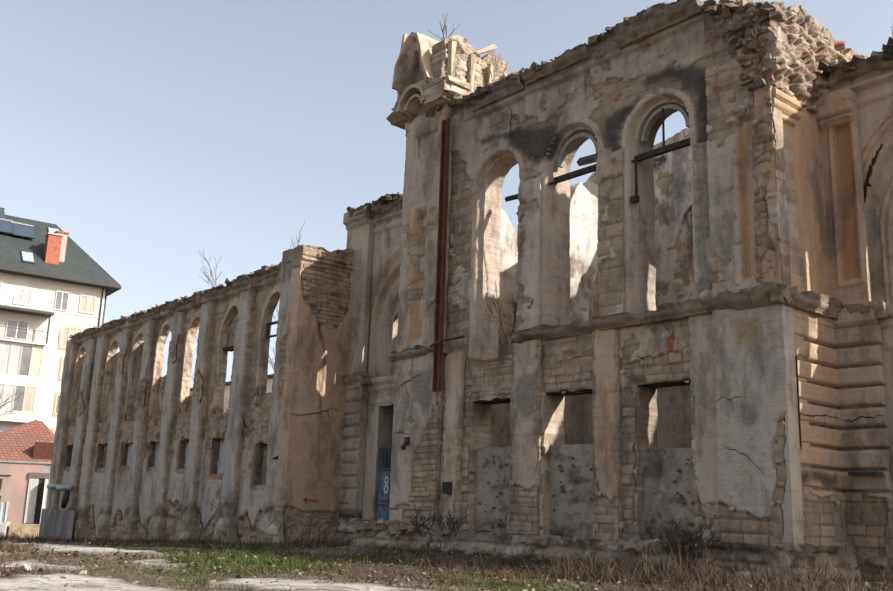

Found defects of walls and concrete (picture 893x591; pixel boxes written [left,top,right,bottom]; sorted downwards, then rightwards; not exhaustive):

spalling [588,16,637,48]
spalling [407,59,554,123]
damp [605,105,634,150]
damp [647,68,708,143]
spalling [702,0,787,278]
crack [863,144,883,204]
spalling [69,295,188,338]
spalling [301,245,354,329]
spalling [540,353,593,396]
spalling [619,351,690,383]
crack [783,412,885,425]
spalling [673,412,788,554]